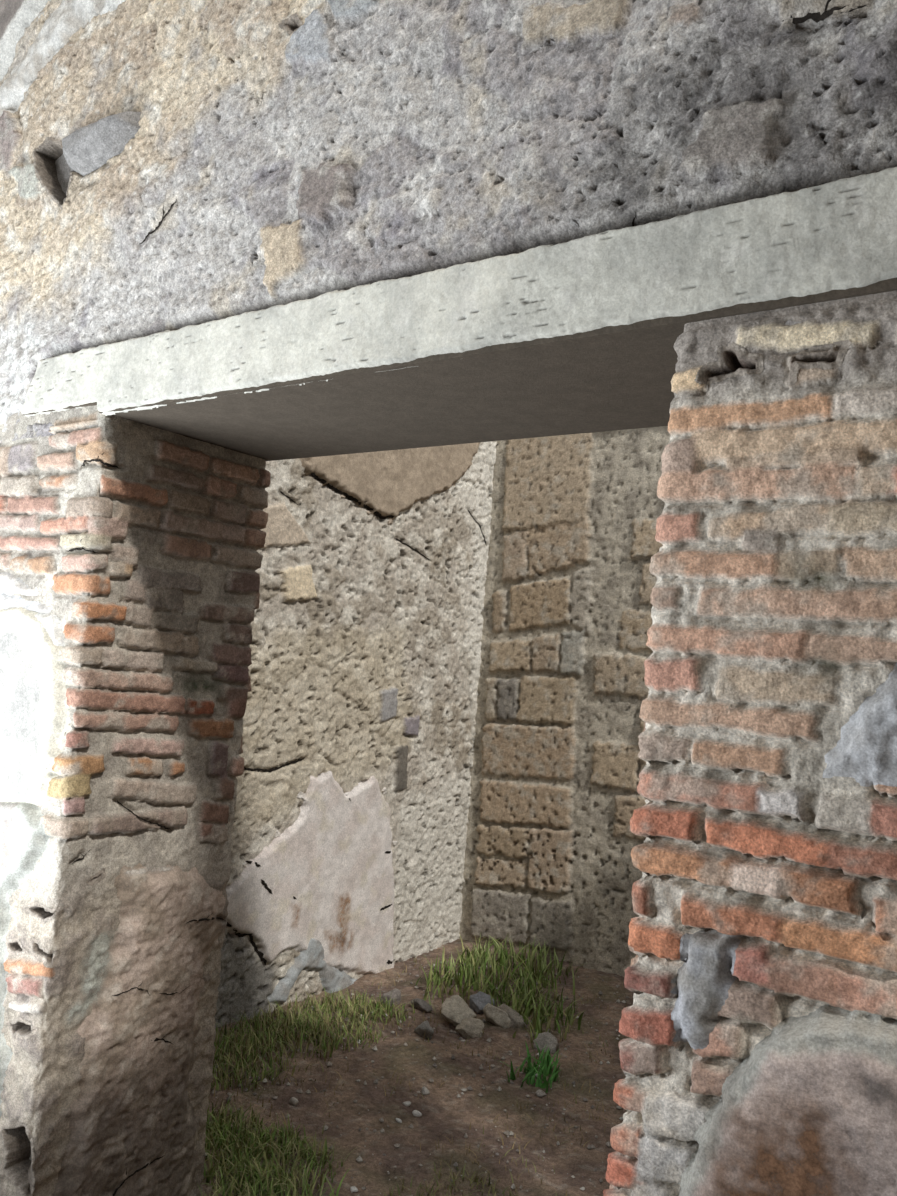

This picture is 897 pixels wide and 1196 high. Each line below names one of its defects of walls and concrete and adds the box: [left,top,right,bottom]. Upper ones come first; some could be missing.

crack [782,0,866,24]
crack [244,758,304,772]
crack [187,915,267,966]